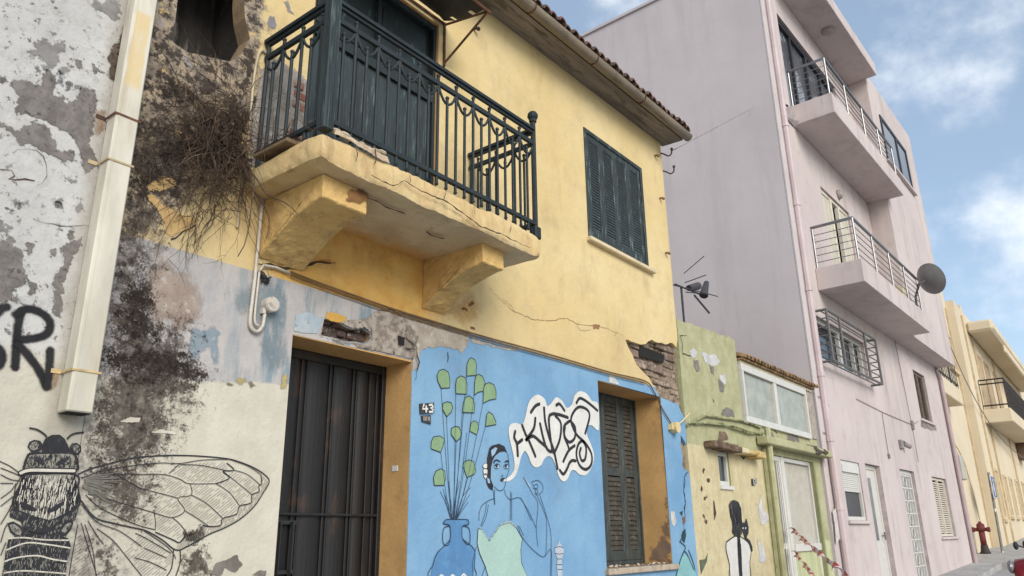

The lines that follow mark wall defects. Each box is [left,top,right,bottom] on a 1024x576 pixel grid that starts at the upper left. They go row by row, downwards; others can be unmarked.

flaking render [92,0,122,21]
flaking render [0,38,105,212]
crack [355,145,531,248]
flaking render [0,199,83,316]
damp [80,74,220,532]
flaking render [237,287,517,370]
crack [489,287,620,336]
flaking render [626,341,680,406]
peeling [690,348,726,392]
damp [79,537,119,576]
damp [178,524,212,576]